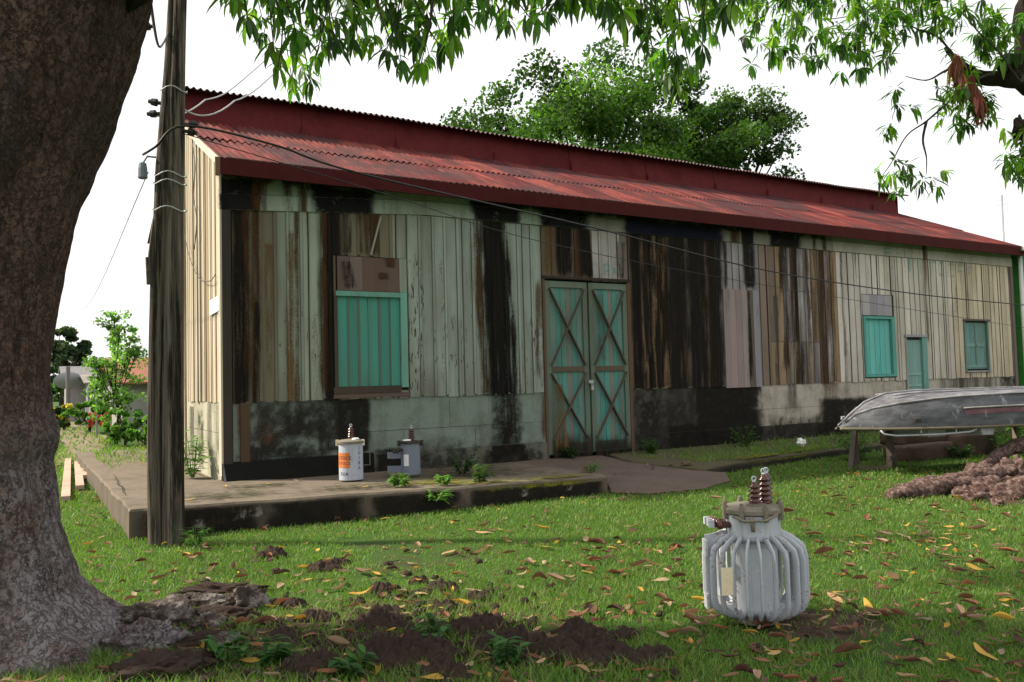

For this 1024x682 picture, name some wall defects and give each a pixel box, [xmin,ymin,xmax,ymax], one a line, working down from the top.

water stain [219,174,401,472]
water stain [420,443,467,469]
water stain [470,200,876,466]